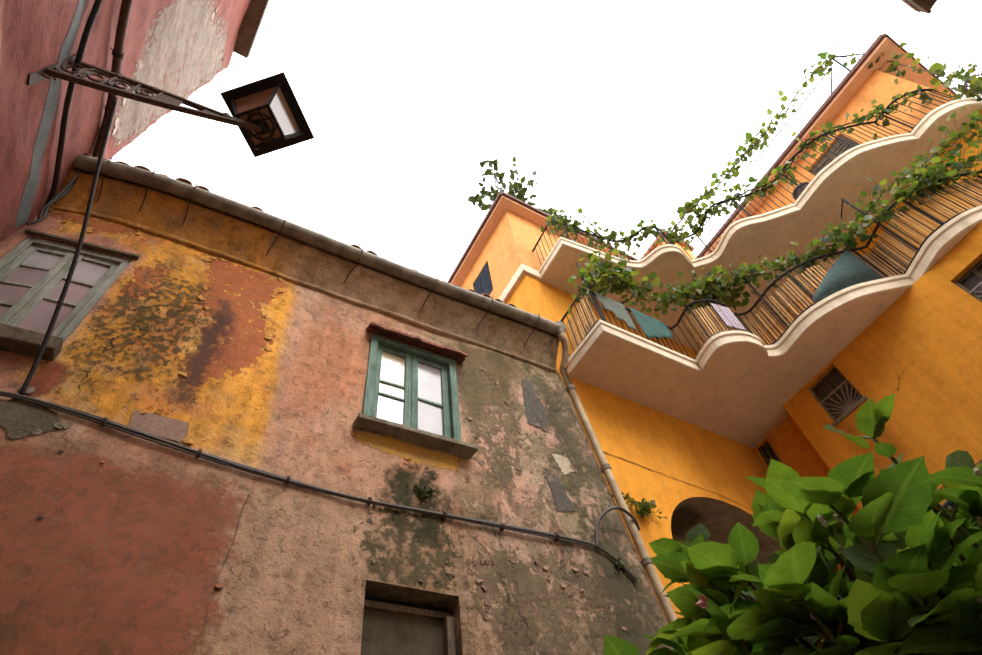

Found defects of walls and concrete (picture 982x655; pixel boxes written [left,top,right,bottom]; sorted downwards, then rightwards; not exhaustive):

peeling [119,263,170,305]
peeling [175,254,288,388]
flaking render [454,362,534,490]
damp [390,468,439,544]
flaking render [544,454,578,482]